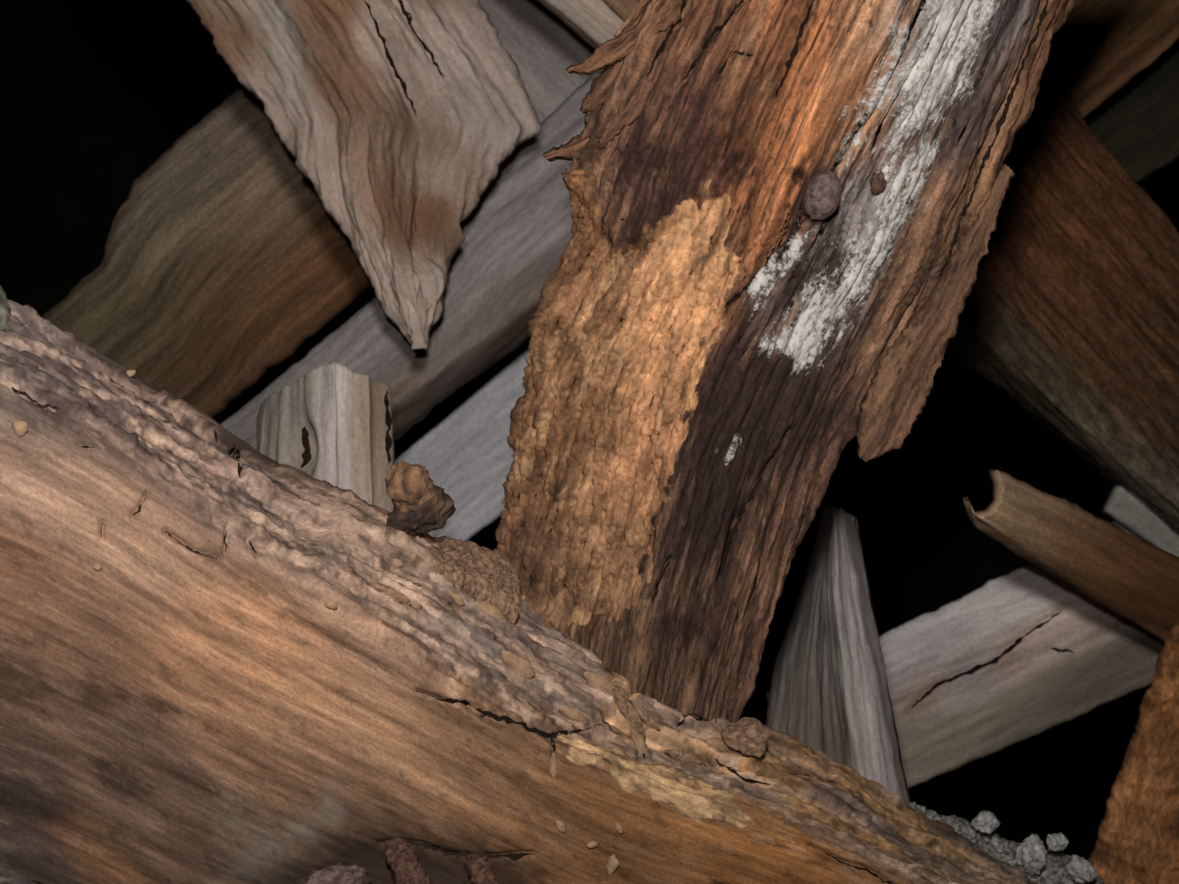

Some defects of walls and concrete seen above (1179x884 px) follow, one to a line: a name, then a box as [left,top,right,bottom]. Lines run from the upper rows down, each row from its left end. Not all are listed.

crack [363,0,444,115]
water stain [659,0,1001,657]
crack [910,608,1075,710]